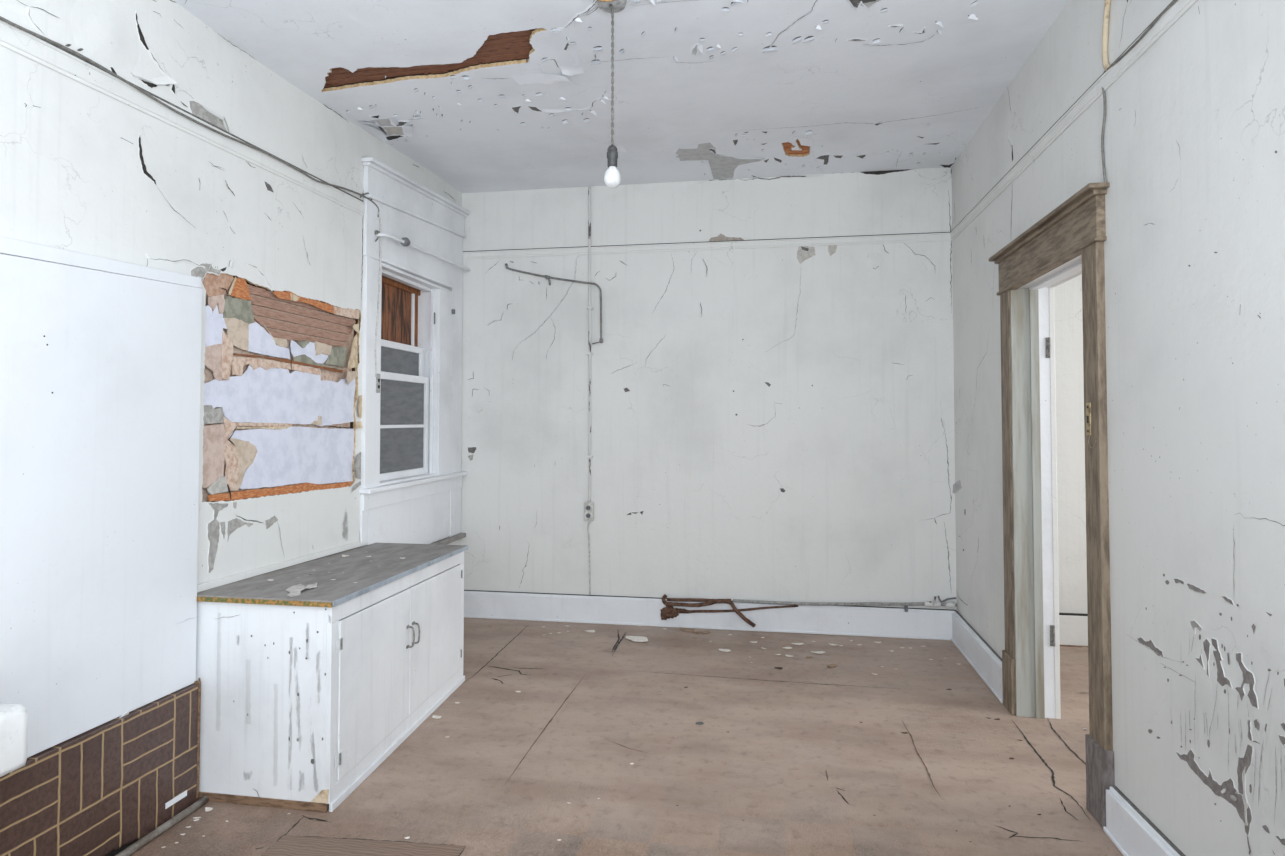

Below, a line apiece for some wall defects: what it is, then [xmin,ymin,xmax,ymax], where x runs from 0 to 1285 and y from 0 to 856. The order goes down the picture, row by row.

spalling [324,29,742,146]
crack [122,133,194,227]
crack [198,161,310,264]
peeling [673,130,868,181]
peeling [887,124,958,168]
crack [144,253,205,268]
flaking render [190,259,363,574]
peeling [1163,574,1239,621]
peeling [1129,620,1285,856]